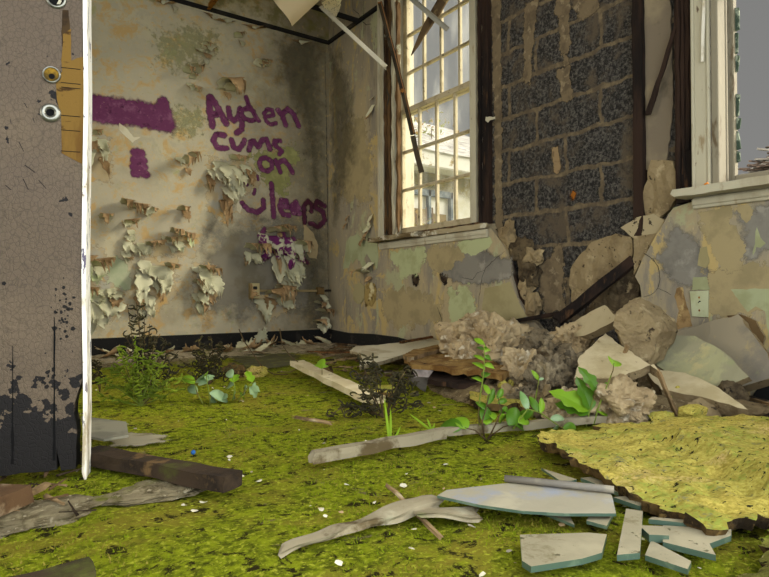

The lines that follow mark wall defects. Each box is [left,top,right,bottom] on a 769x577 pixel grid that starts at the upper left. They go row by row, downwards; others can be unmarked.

peeling [91,129,113,184]
peeling [119,123,140,143]
peeling [175,151,262,227]
peeling [335,97,379,307]
peeling [90,198,225,335]
peeling [244,224,318,325]
peeling [313,294,335,334]
peeling [390,246,427,287]
peeling [457,236,493,256]
peeling [439,273,526,322]
spalling [674,287,692,329]
peeling [731,288,769,337]